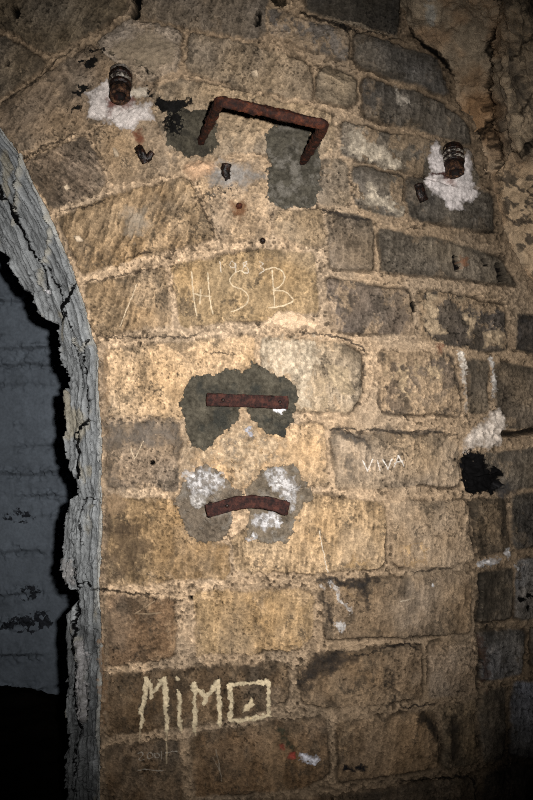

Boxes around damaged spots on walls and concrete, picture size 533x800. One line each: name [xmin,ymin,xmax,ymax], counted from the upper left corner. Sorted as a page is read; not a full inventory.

crack [409,26,455,76]
crack [0,180,150,479]
leakage [463,410,506,454]